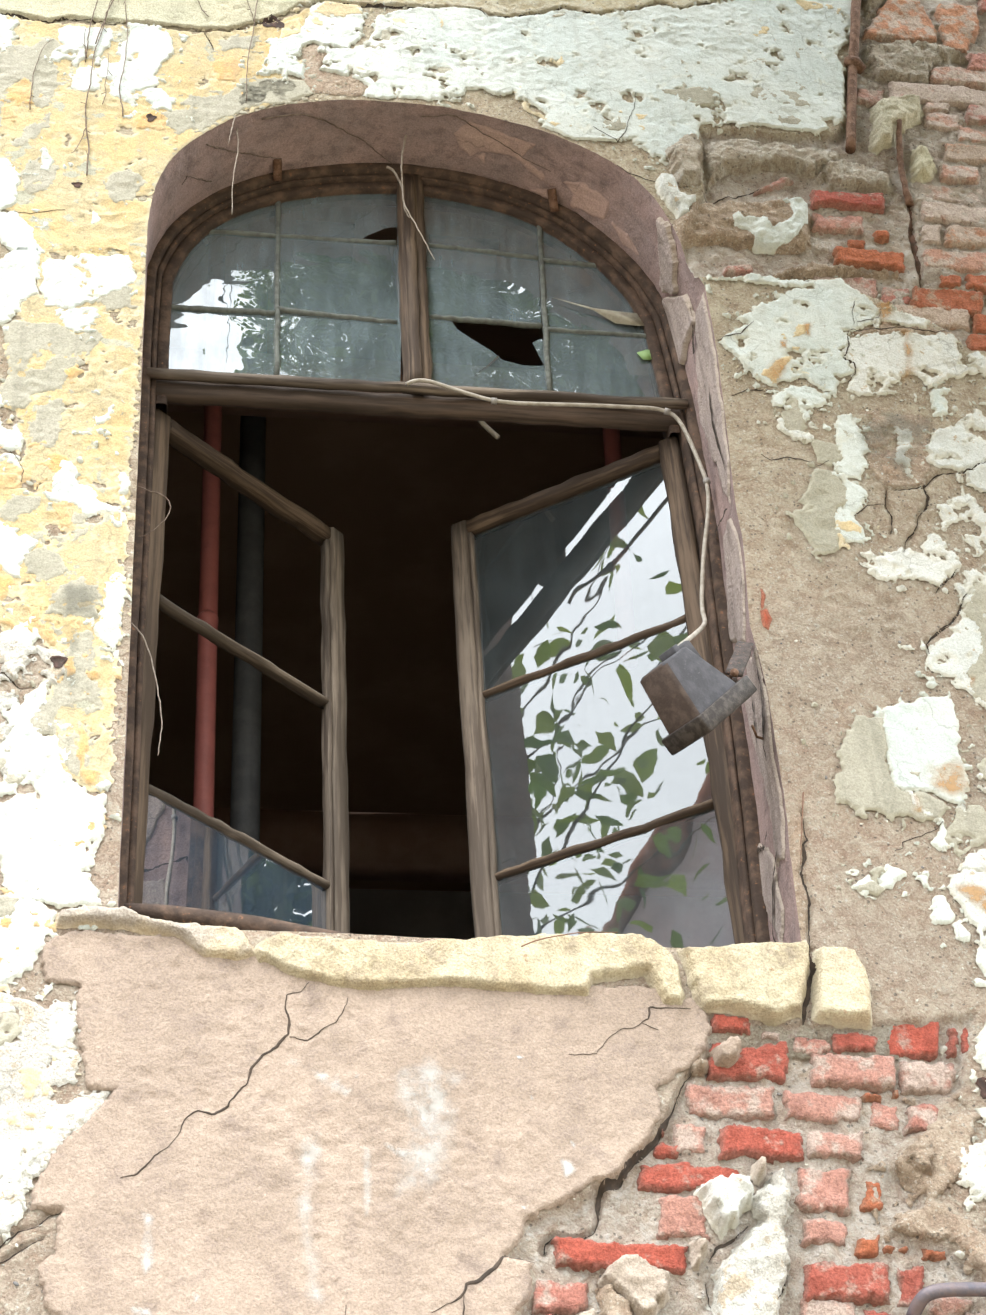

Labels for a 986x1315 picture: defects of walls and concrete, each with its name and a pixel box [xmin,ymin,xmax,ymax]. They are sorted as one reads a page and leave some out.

crack [0,13,120,24]
peeling [0,0,896,631]
flaking render [701,0,986,709]
crack [854,462,985,551]
peeling [0,598,130,1245]
crack [756,815,817,1025]
peeling [831,691,986,987]
crack [121,982,348,1178]
crack [569,1006,690,1055]
crack [584,1071,693,1240]
flaking render [531,1014,986,1315]
crack [432,1238,553,1315]